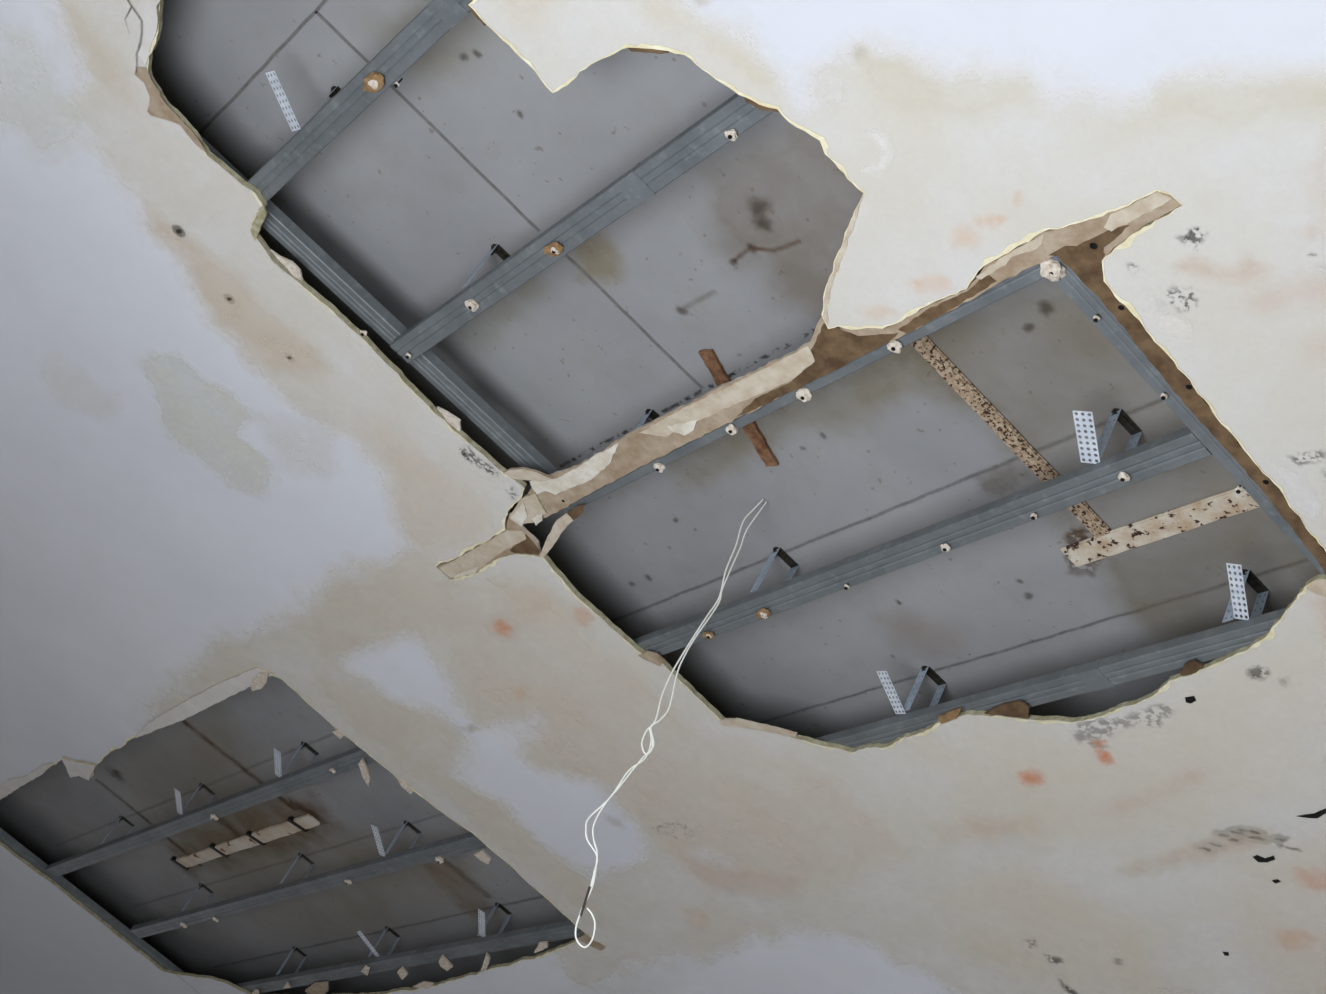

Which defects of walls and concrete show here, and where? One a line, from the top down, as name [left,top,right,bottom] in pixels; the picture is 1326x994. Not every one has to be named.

water stain [480,0,589,91]
peeling [134,67,206,152]
peeling [1104,191,1172,231]
peeling [270,249,303,281]
water stain [62,0,518,550]
water stain [591,0,1326,550]
peeling [437,406,461,431]
peeling [639,346,815,437]
peeling [529,443,619,495]
water stain [156,534,1326,994]
peeling [719,718,797,737]
peeling [984,700,1030,719]